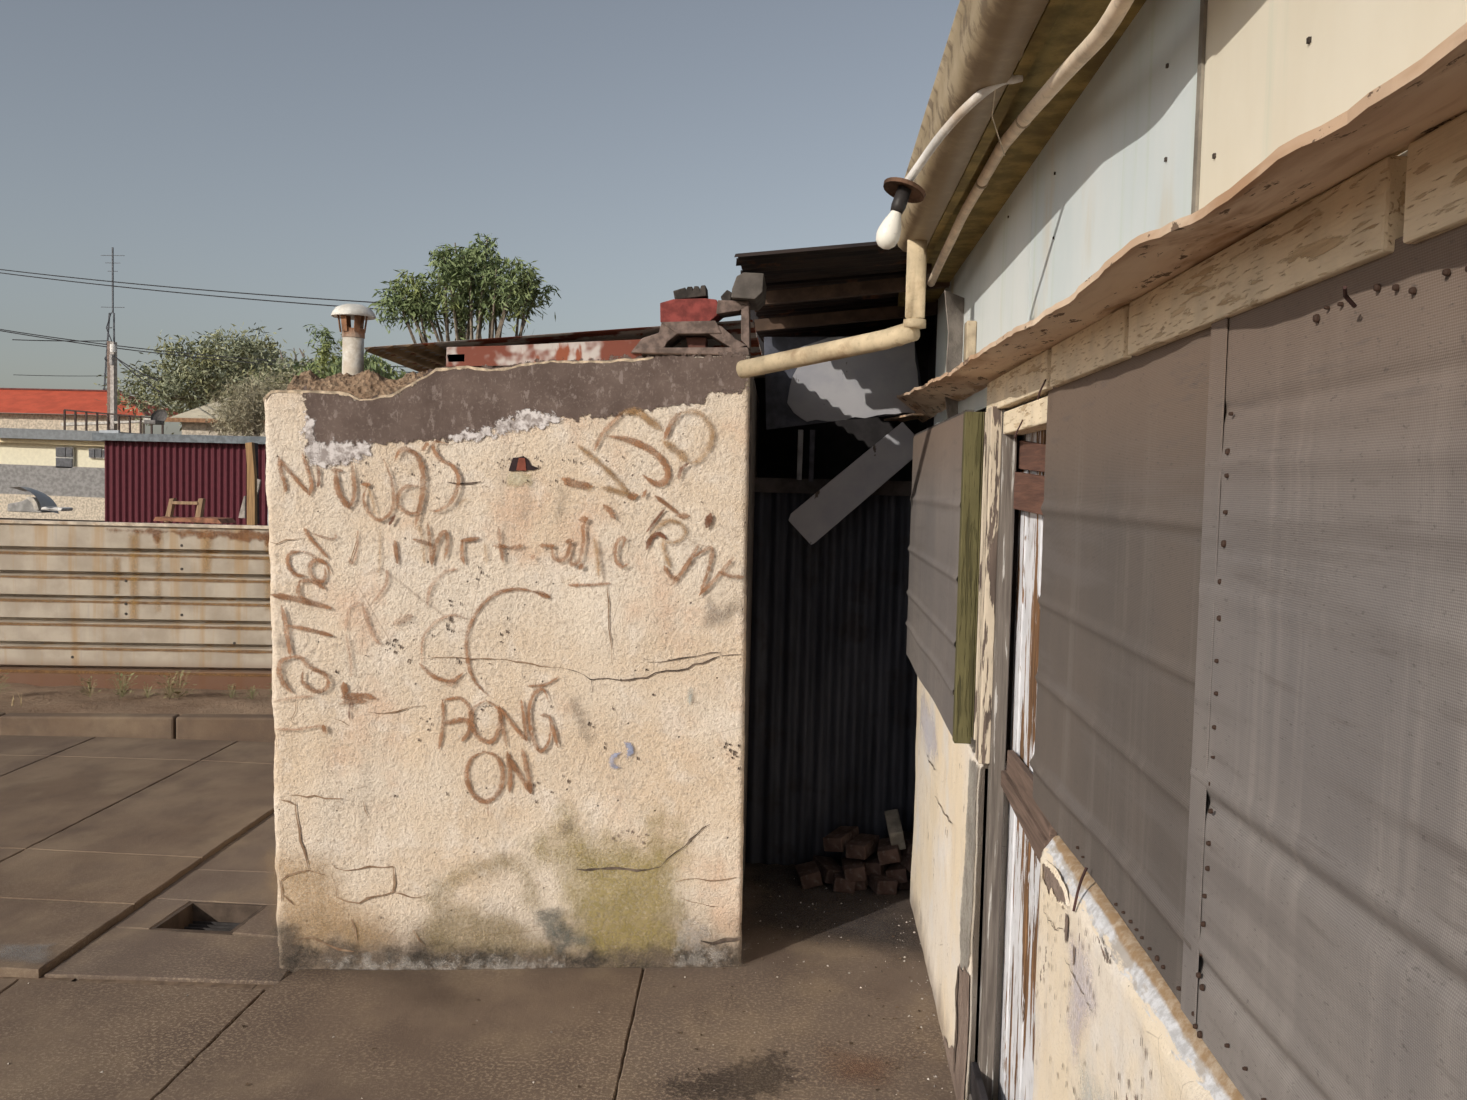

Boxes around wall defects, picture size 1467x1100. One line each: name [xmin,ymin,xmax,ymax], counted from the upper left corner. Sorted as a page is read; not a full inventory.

peeling [263,351,749,483]
crack [423,589,742,690]
crack [279,795,428,952]
crack [577,824,742,948]
flaking render [944,760,978,1100]